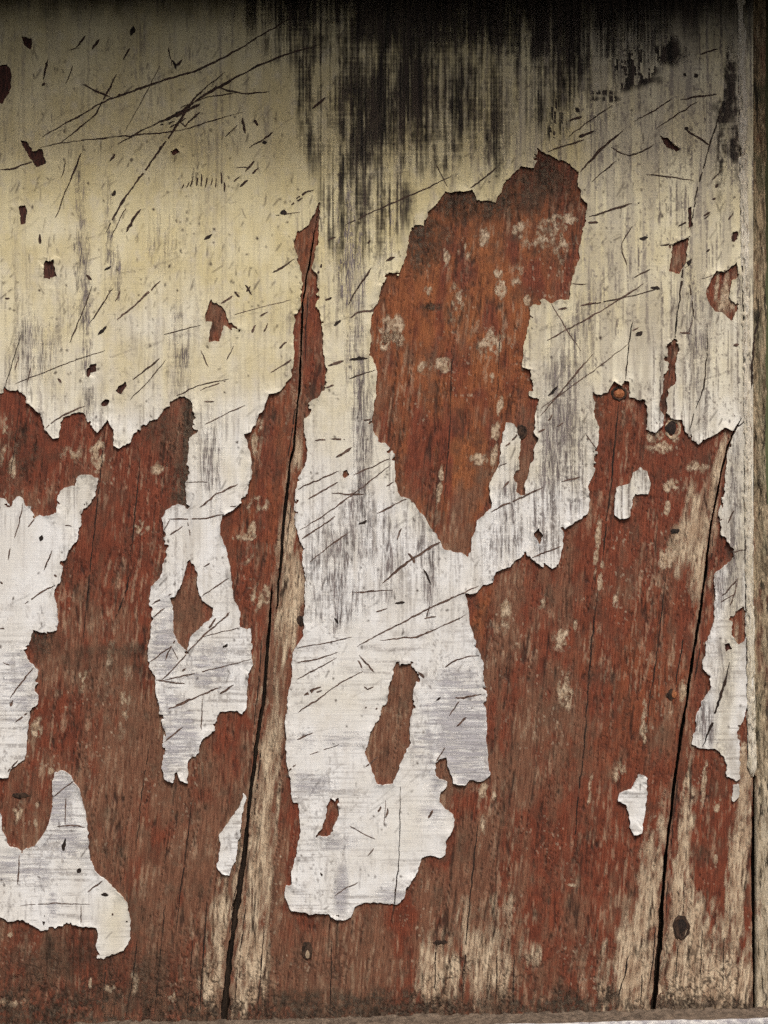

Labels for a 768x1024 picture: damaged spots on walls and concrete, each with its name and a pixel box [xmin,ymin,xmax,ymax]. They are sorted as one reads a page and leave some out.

crack [102,212,319,1020]
peeling [0,202,753,1024]
crack [618,421,748,1009]
crack [742,266,761,389]